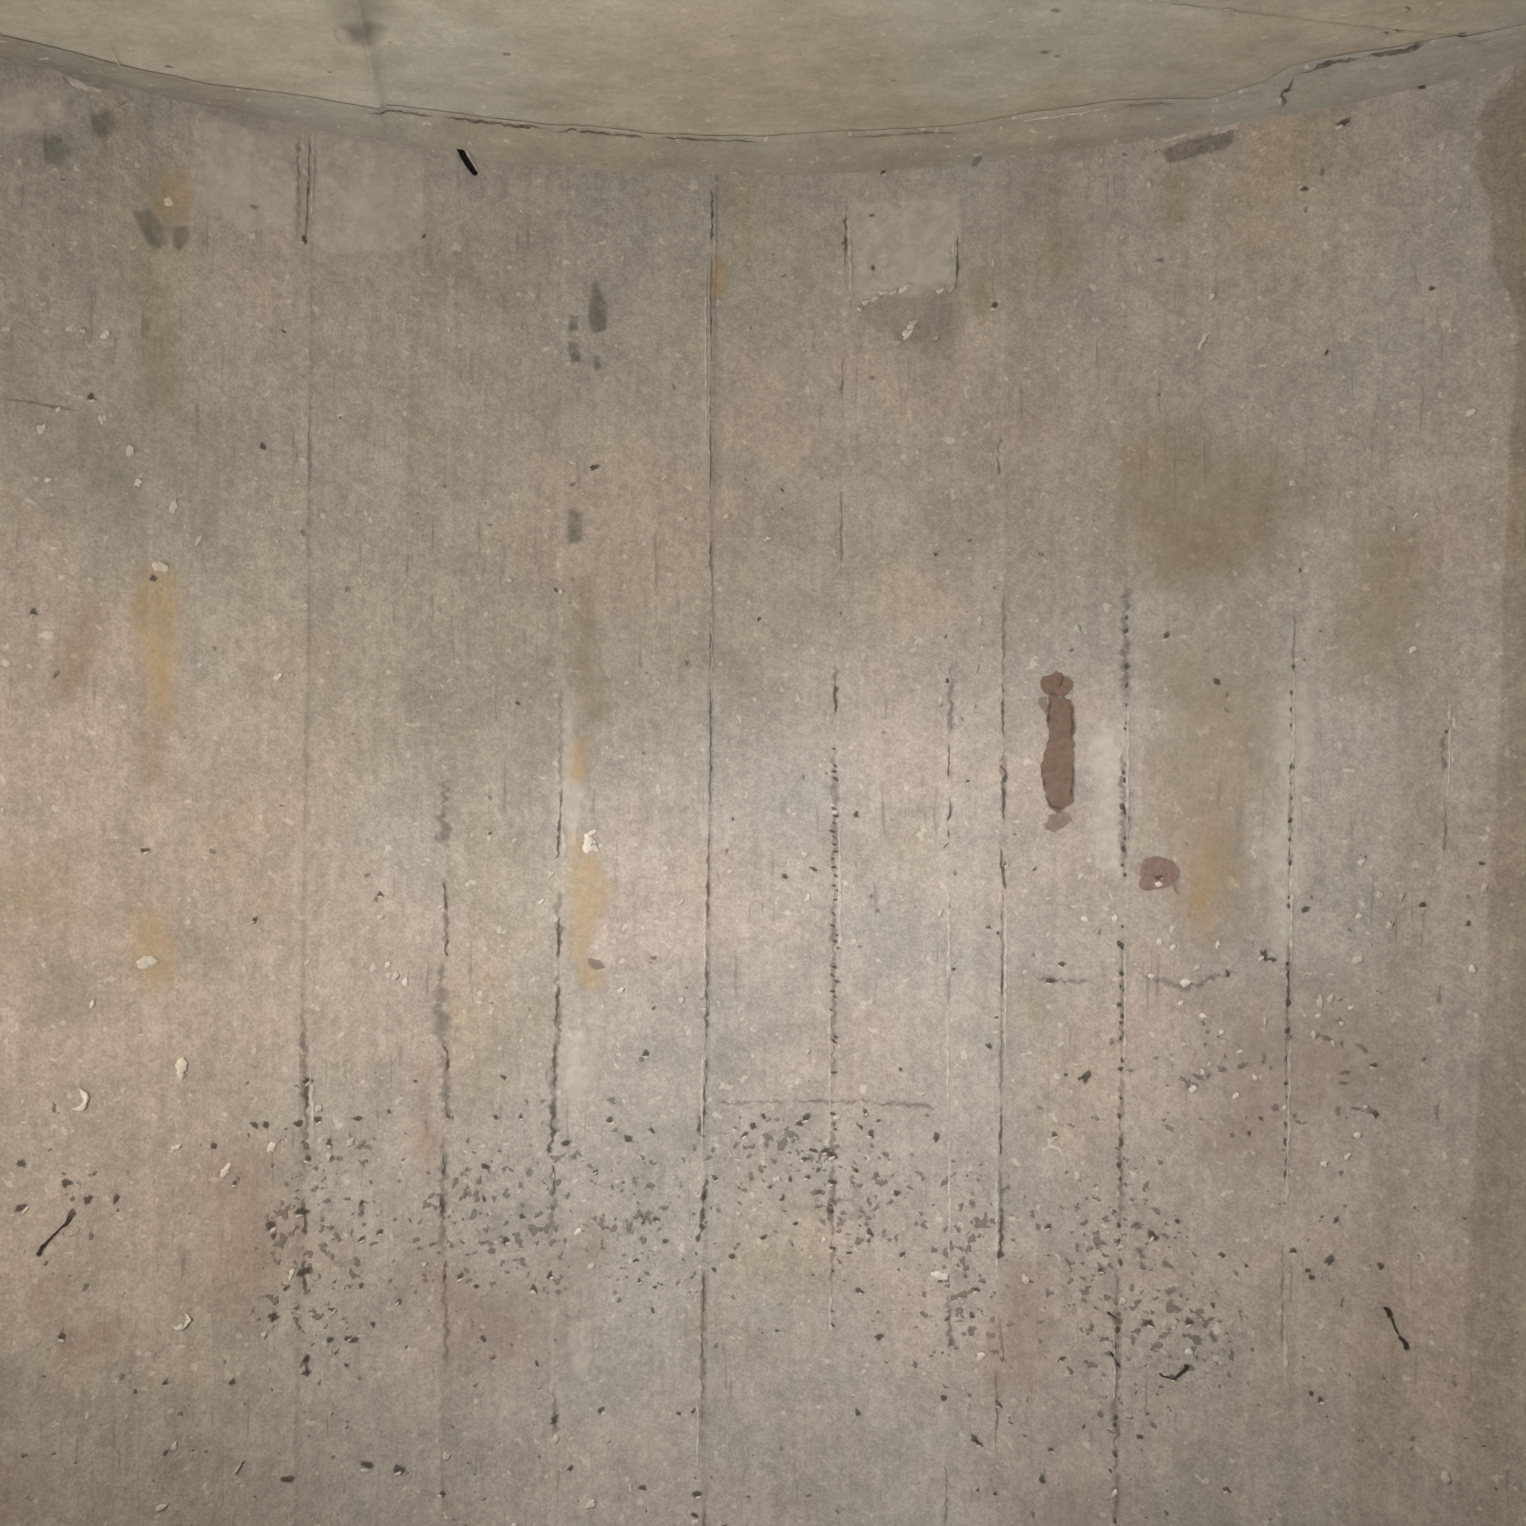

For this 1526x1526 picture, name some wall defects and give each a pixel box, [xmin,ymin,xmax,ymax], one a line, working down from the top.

rust [1139,857,1179,893]